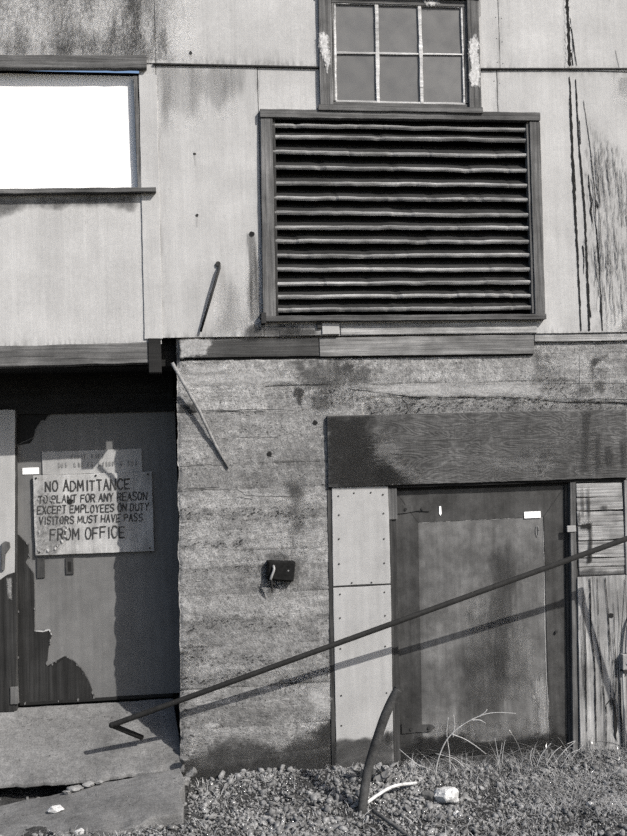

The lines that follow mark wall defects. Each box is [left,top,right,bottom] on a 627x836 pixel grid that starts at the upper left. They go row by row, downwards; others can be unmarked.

leakage [57,0,148,55]
peeling [319,32,330,73]
peeling [468,36,481,87]
leakage [186,358,370,407]
leakage [328,415,404,486]
peeling [0,525,95,712]
crack [580,578,625,747]